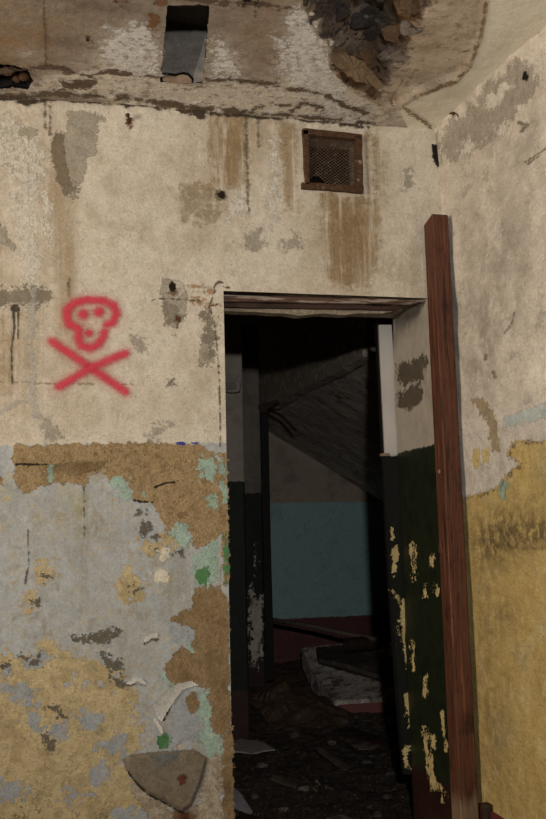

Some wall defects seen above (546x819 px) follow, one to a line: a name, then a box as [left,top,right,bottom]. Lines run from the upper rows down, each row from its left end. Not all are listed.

crack [185,0,291,12]
crack [0,64,376,129]
crack [389,2,487,130]
leakage [178,116,295,232]
leakage [0,113,55,418]
leakage [322,192,379,285]
leakage [395,353,429,412]
peeling [459,418,546,501]
peeling [0,418,236,819]
peeling [247,556,265,672]
peeling [388,589,415,672]
peeling [421,710,448,804]